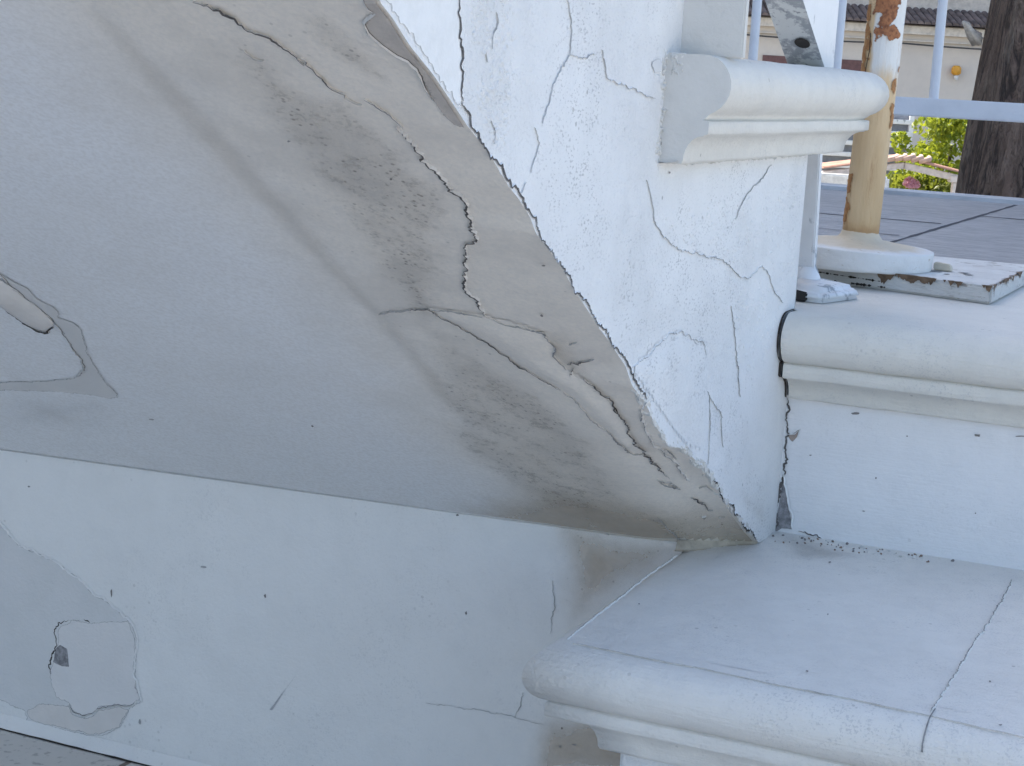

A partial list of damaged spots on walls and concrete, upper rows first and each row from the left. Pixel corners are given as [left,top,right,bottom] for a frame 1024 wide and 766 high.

corrosion [861,0,901,72]
corrosion [889,67,900,128]
corrosion [843,173,853,223]
crack [193,0,824,540]
peeling [0,274,118,399]
peeling [0,520,142,736]
crack [550,518,1024,752]